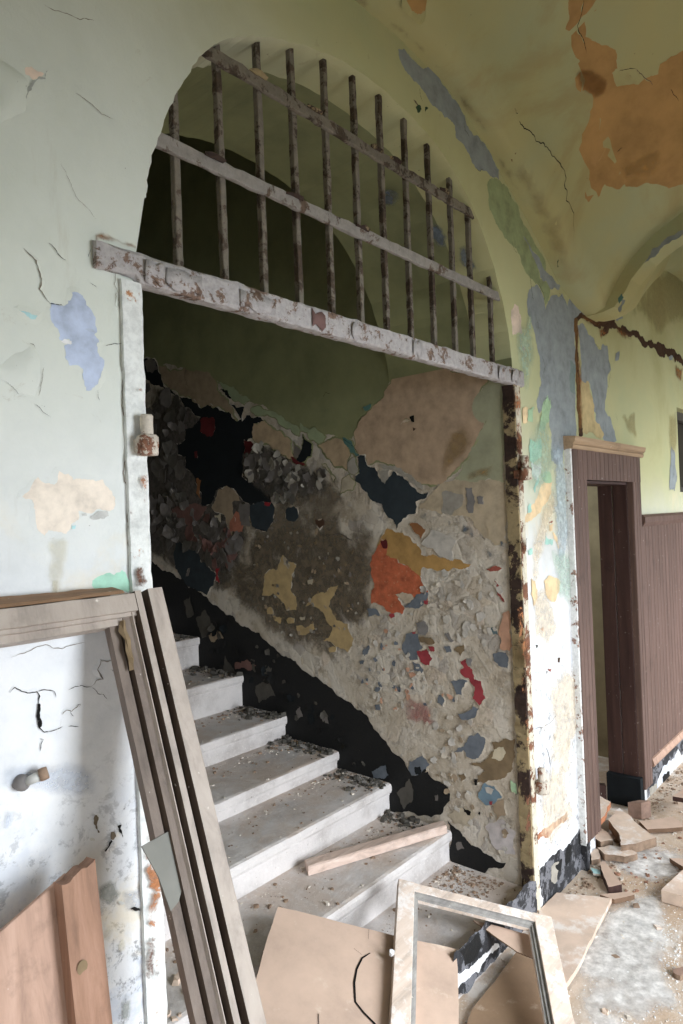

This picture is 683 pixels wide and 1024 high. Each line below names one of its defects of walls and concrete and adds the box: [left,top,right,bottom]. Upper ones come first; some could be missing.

flaking render [563,0,683,207]
crack [515,109,574,225]
crack [25,243,91,305]
peeling [45,286,106,394]
peeling [397,45,620,555]
corrosion [574,312,683,437]
peeling [16,466,120,539]
damp [147,390,371,658]
peeling [144,357,518,873]
peeling [531,575,561,605]
crack [9,659,113,750]